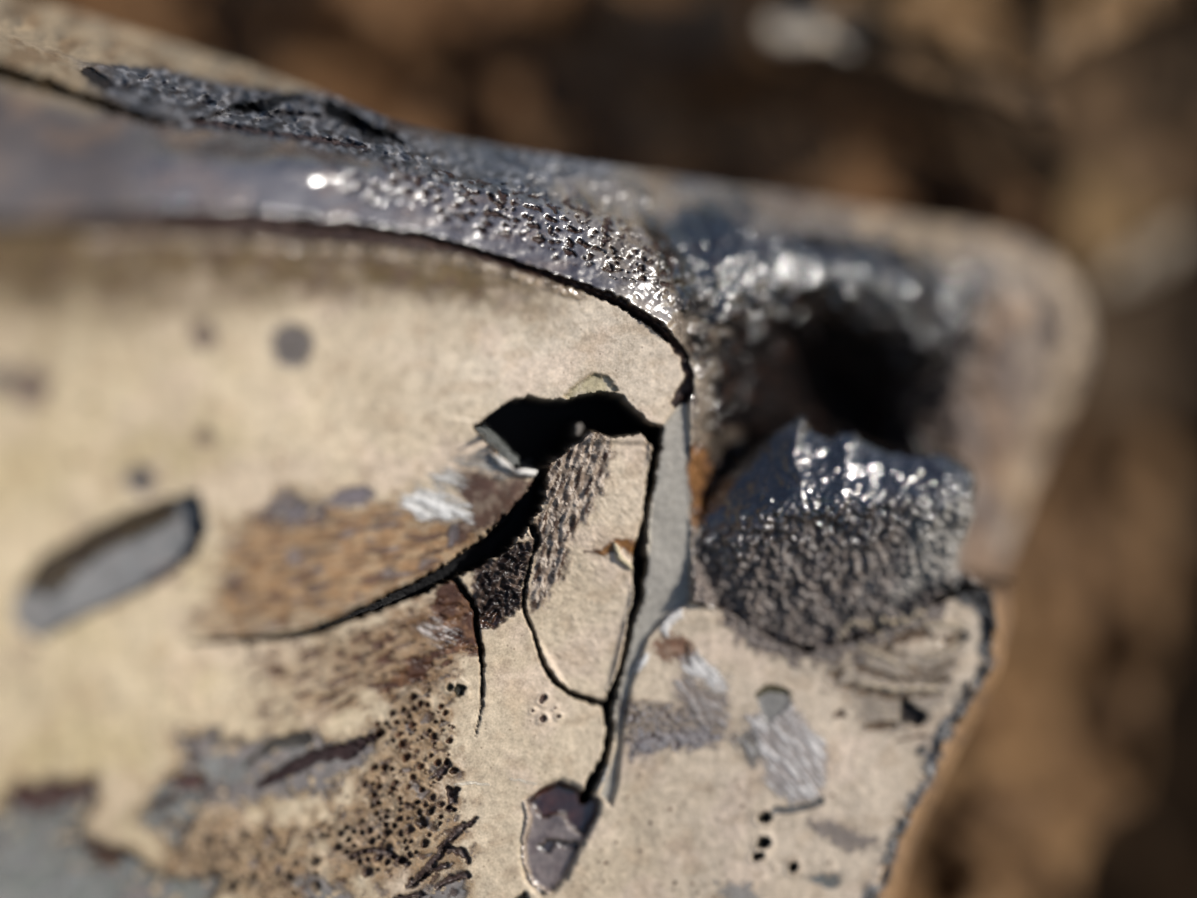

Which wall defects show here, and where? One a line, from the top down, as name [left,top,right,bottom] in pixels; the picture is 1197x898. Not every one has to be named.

crack [0,65,405,149]
spalling [11,495,204,639]
crack [51,207,693,804]
peeling [613,498,651,570]
corrosion [147,471,534,898]
peeling [606,590,722,758]
peeling [0,679,474,898]